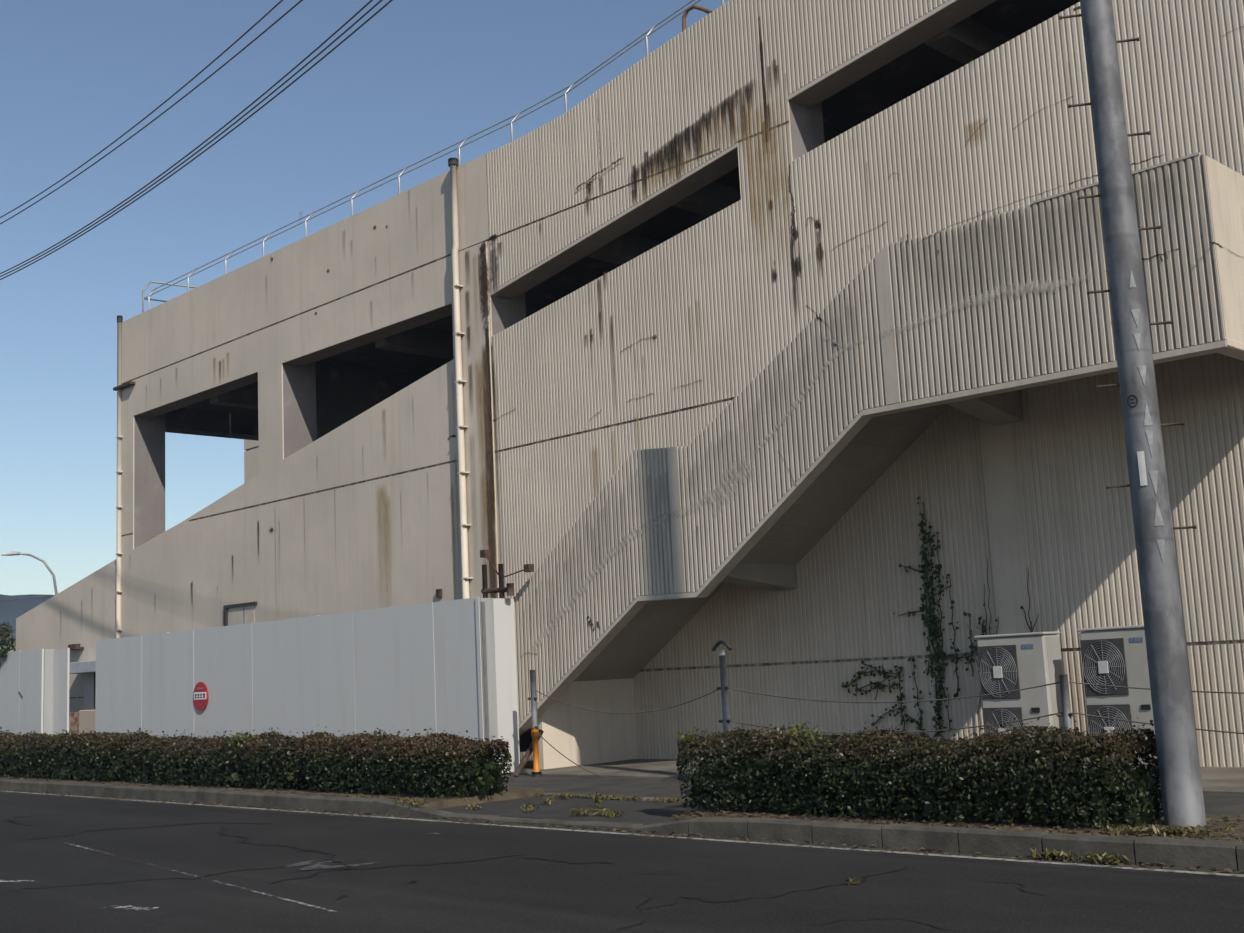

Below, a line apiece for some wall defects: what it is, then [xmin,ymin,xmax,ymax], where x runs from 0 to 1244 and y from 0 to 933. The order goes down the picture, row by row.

damp [576,17,778,203]
damp [806,217,824,260]